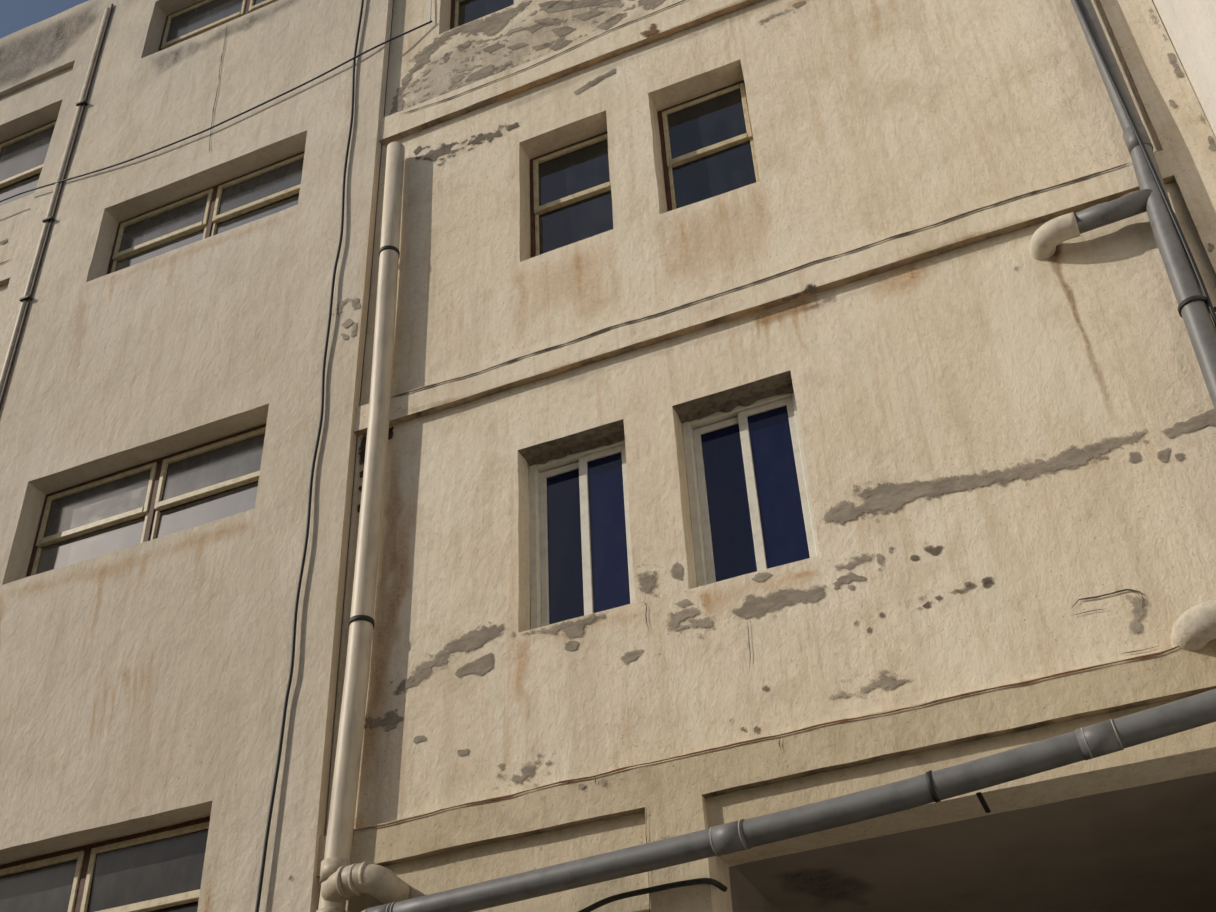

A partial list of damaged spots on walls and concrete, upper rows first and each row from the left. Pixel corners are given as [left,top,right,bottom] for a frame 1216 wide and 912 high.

crack [209,28,227,151]
peeling [390,0,664,115]
peeling [414,122,519,165]
crack [393,163,1129,397]
peeling [1157,409,1216,462]
peeling [824,429,1148,525]
peeling [667,599,715,638]
peeling [732,547,893,619]
peeling [364,614,605,731]
peeling [621,649,643,664]
peeling [830,670,909,699]
peeling [497,754,552,788]